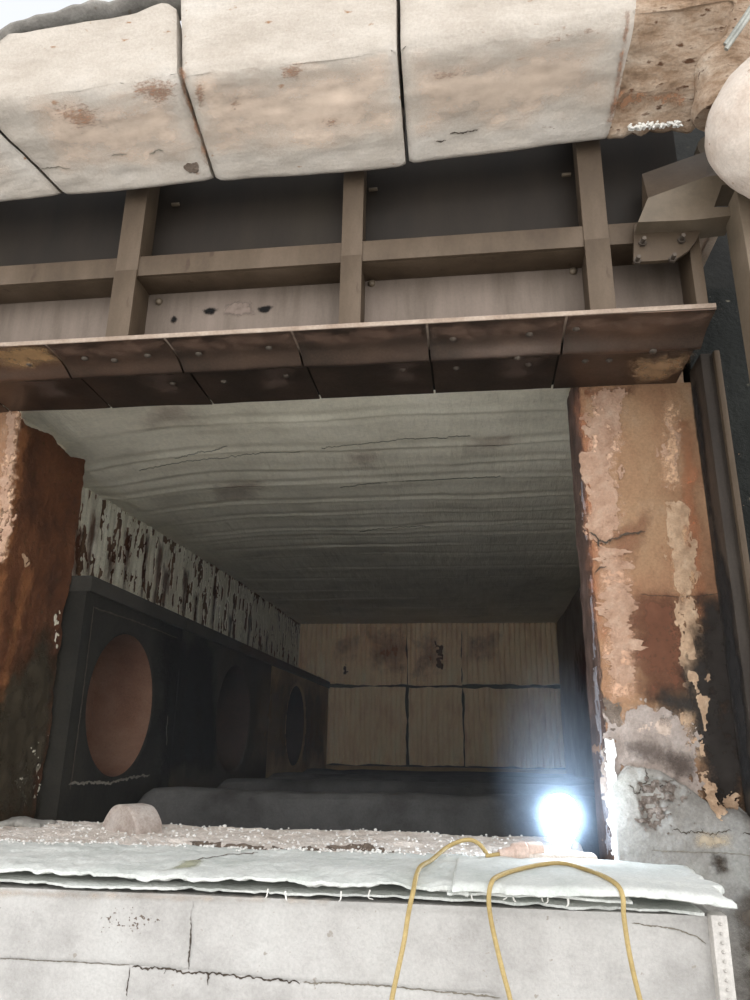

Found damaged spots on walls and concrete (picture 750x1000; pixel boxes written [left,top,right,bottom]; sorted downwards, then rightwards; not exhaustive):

corrosion [135,70,185,102]
corrosion [55,104,93,125]
crack [140,446,295,471]
crack [322,435,469,449]
corrosion [73,515,96,576]
corrosion [107,534,131,577]
corrosion [141,537,170,607]
peeling [72,487,300,668]
corrosion [182,572,199,621]
crack [589,531,646,575]
peeling [579,387,740,838]
crack [0,902,499,1000]